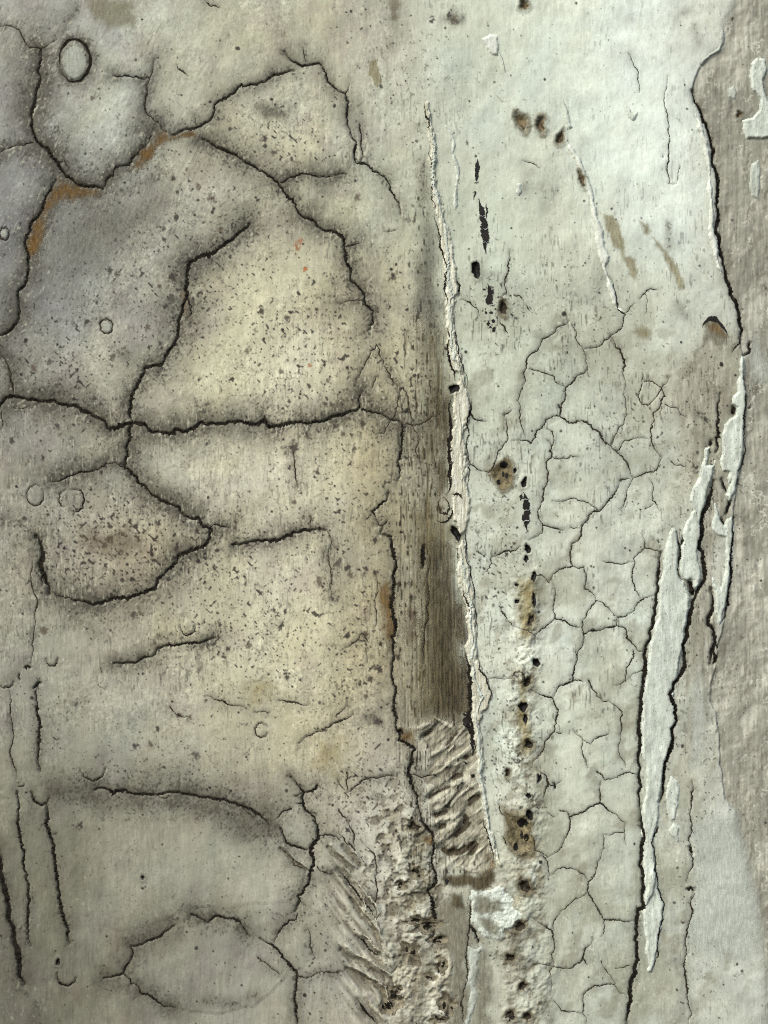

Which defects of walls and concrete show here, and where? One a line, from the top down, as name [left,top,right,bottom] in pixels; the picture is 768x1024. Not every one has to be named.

crack [0,25,442,1024]
peeling [328,101,522,1024]
water stain [416,418,469,719]
crack [457,94,751,1022]
peeling [640,356,747,973]
peeling [742,58,768,139]